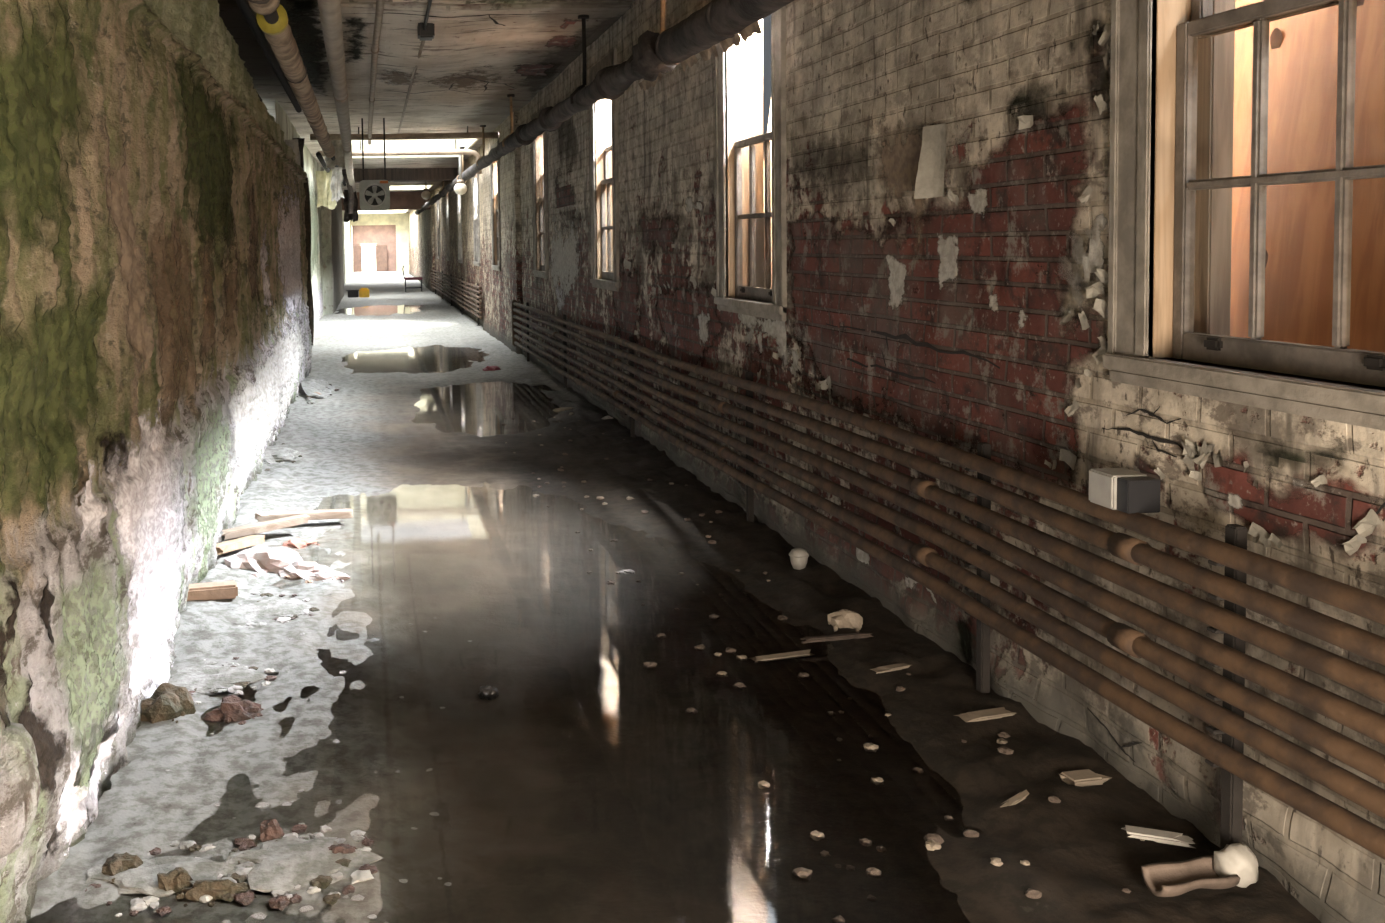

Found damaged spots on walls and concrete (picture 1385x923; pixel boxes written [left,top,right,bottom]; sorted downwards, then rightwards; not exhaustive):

water stain [382,66,500,89]
water stain [38,188,72,294]
water stain [226,181,323,486]
peeling [611,21,1111,488]
crack [1102,406,1184,457]
water stain [47,404,185,842]